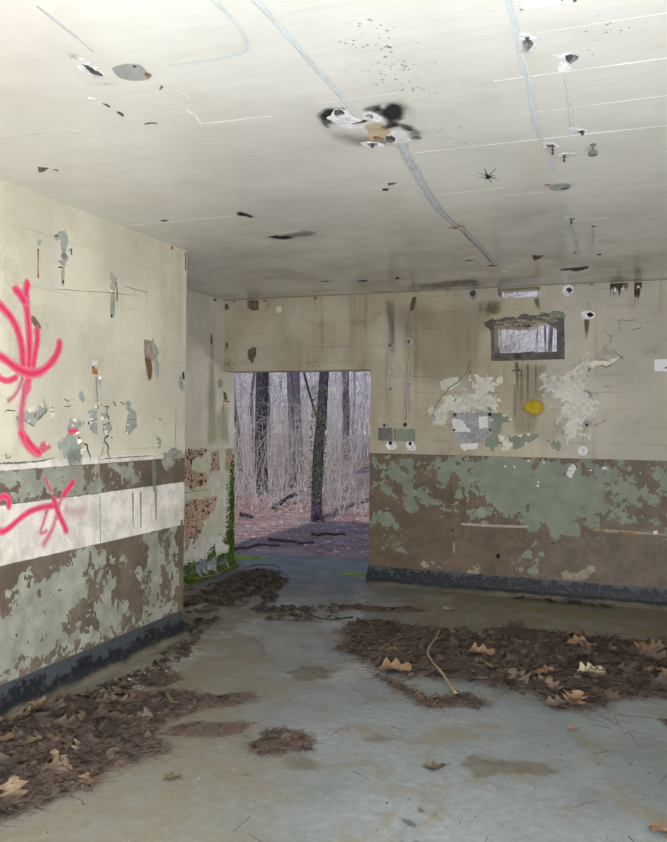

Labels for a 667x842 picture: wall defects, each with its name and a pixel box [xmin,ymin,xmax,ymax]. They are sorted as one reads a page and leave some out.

spalling [327,108,428,148]
peeling [54,230,72,286]
peeling [16,399,55,427]
peeling [0,400,141,503]
peeling [369,311,667,578]
peeling [0,436,233,682]
peeling [561,565,596,581]